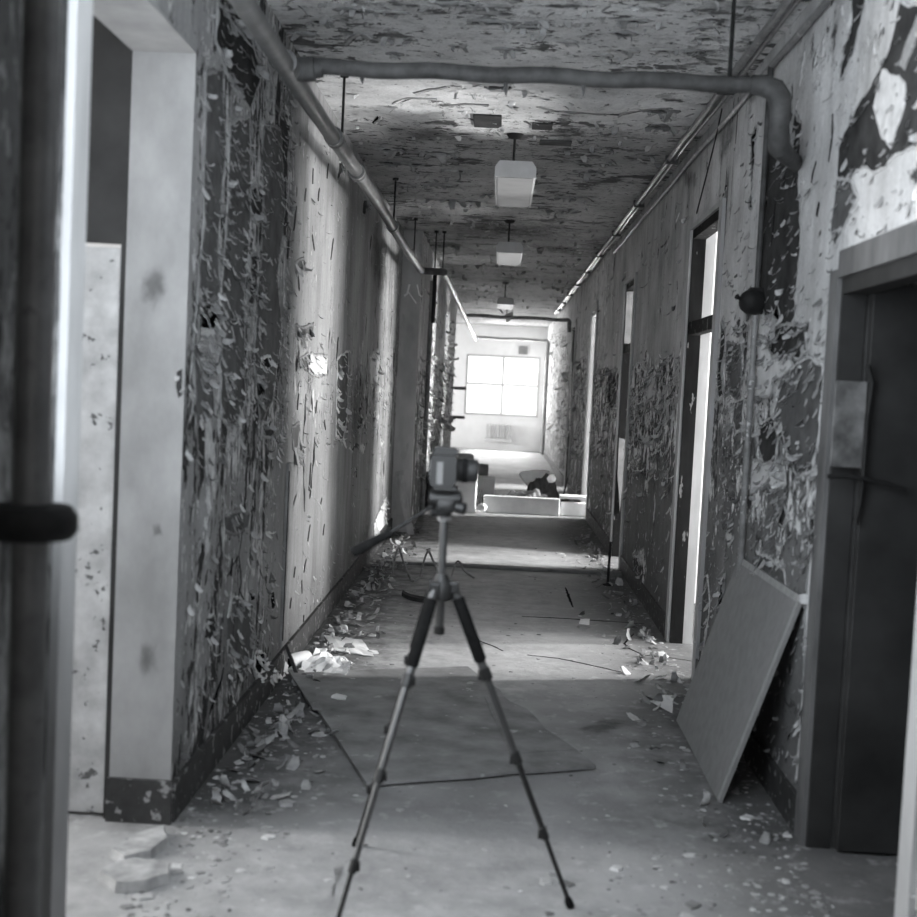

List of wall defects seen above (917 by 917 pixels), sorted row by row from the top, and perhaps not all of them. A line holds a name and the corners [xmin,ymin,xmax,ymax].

peeling [420,0,553,36]
peeling [588,18,721,65]
peeling [480,84,515,93]
peeling [641,109,681,137]
peeling [748,121,759,210]
peeling [829,0,917,251]
peeling [174,1,288,443]
peeling [295,256,314,277]
peeling [295,322,353,448]
peeling [369,348,385,388]
peeling [628,350,676,445]
peeling [713,153,824,496]